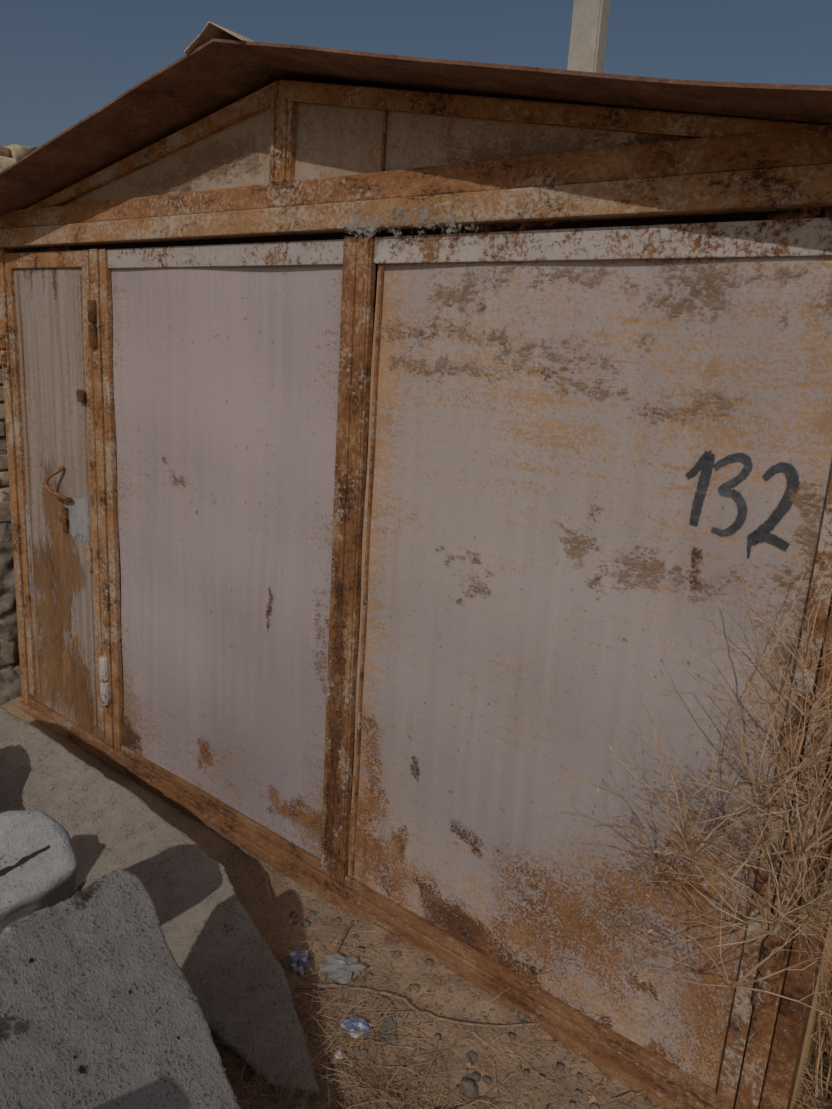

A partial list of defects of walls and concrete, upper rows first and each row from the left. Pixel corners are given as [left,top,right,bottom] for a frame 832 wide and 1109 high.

corrosion [128,130,266,197]
corrosion [29,458,105,742]
corrosion [690,546,703,592]
corrosion [267,580,769,1086]